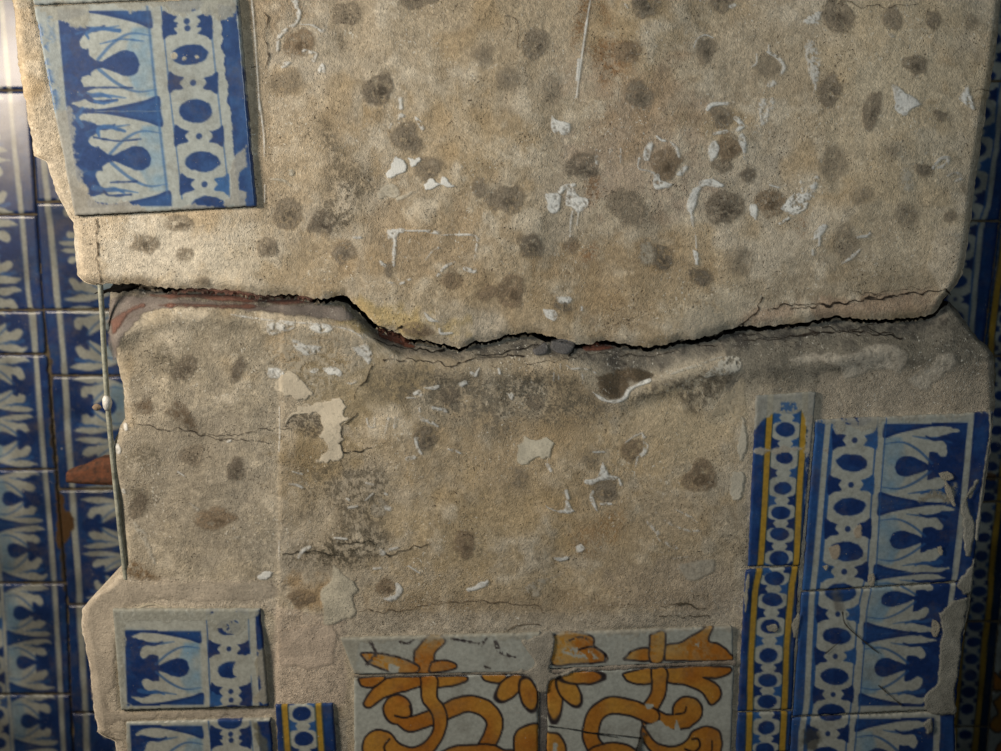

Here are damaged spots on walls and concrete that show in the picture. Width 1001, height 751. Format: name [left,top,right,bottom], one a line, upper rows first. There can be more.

spalling [107,278,372,463]
crack [94,219,951,454]
crack [282,540,428,557]